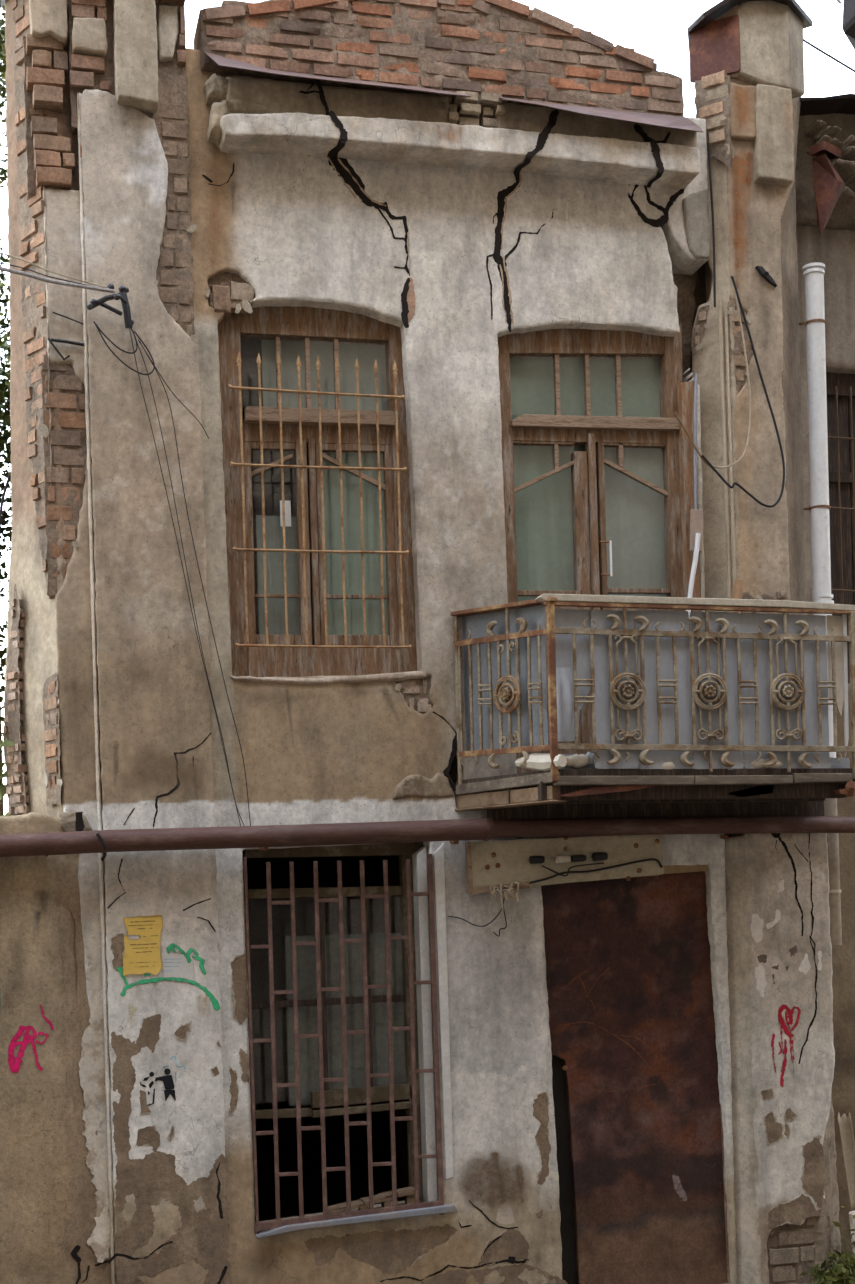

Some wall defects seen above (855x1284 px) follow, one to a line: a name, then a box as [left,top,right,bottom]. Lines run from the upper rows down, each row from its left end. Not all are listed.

flaking render [12,0,88,599]
flaking render [152,92,255,344]
crack [299,79,411,276]
crack [486,110,559,332]
crack [628,124,684,227]
flaking render [3,584,92,832]
crack [123,733,211,828]
crack [771,833,818,1064]
peeling [78,933,231,1284]
crack [380,1200,529,1282]
peeling [533,1092,551,1185]
flaking render [760,1088,831,1284]